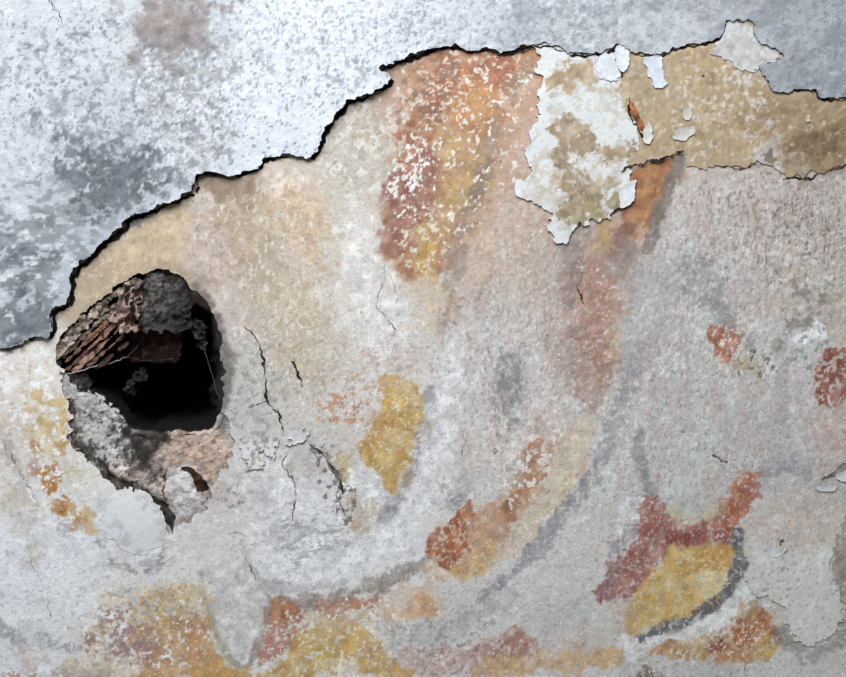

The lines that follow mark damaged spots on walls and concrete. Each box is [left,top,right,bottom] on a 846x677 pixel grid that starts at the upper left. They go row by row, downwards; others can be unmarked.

flaking render [514,19,846,244]
spalling [49,268,235,533]
crack [244,326,284,430]
crack [291,360,303,387]
crack [281,454,296,521]
crack [310,444,346,517]
peeling [814,462,846,492]